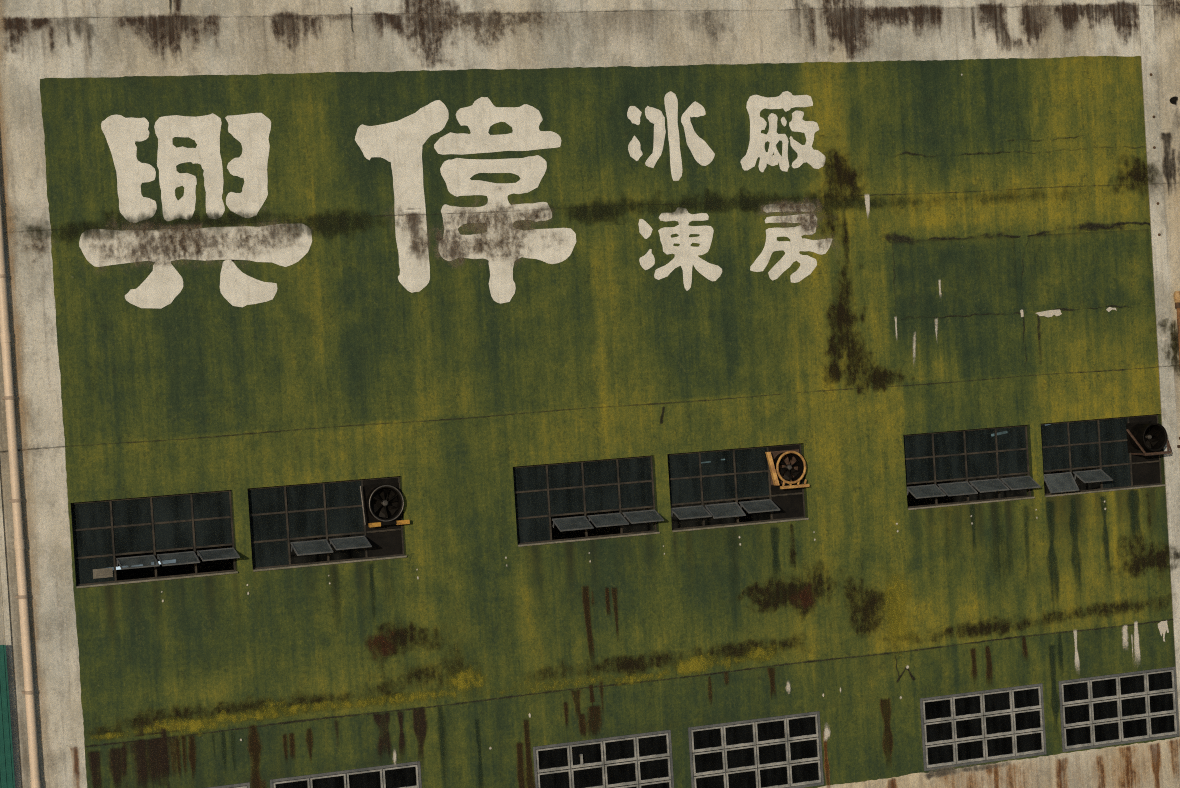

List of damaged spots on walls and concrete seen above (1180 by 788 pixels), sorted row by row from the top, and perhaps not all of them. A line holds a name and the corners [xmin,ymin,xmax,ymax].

leakage [456,10,543,45]
leakage [568,151,903,394]
mould [1160,320,1180,371]
rust [582,586,618,654]
peeling [1158,620,1169,642]
rust [564,682,603,736]
rust [74,725,195,788]
rust [517,720,535,788]
rust [1057,759,1067,788]
rust [1097,757,1105,788]
rust [1121,746,1136,788]
rust [1150,740,1180,788]